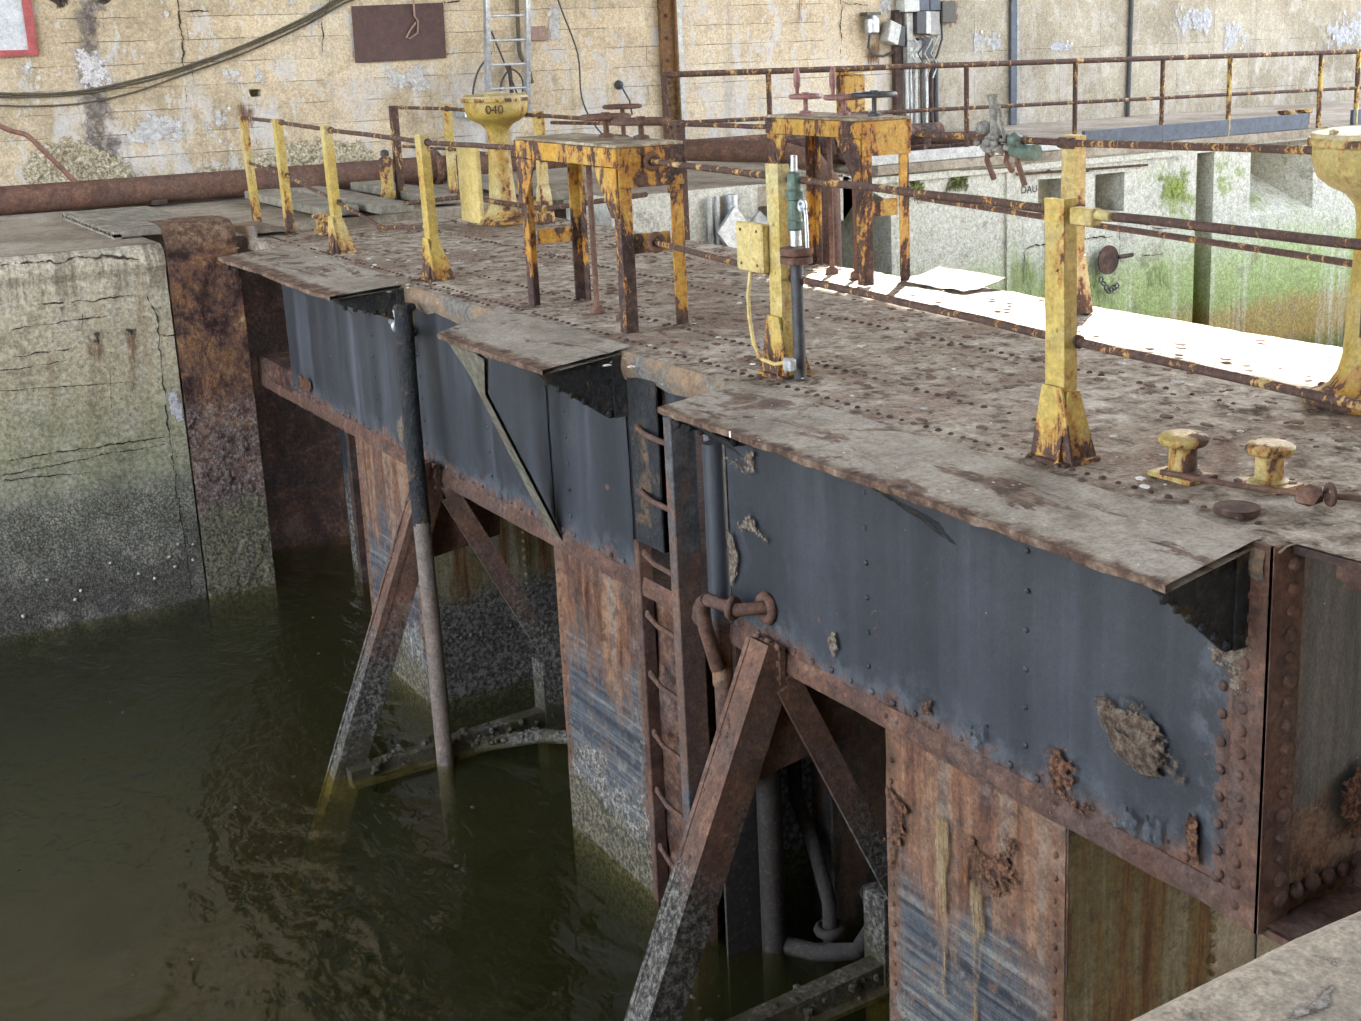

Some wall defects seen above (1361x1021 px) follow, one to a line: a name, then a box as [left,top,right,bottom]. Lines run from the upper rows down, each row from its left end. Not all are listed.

leakage [74,0,121,180]
corrosion [1095,696,1185,786]
corrosion [883,786,912,871]
corrosion [935,816,1019,967]
crack [1287,955,1337,1019]